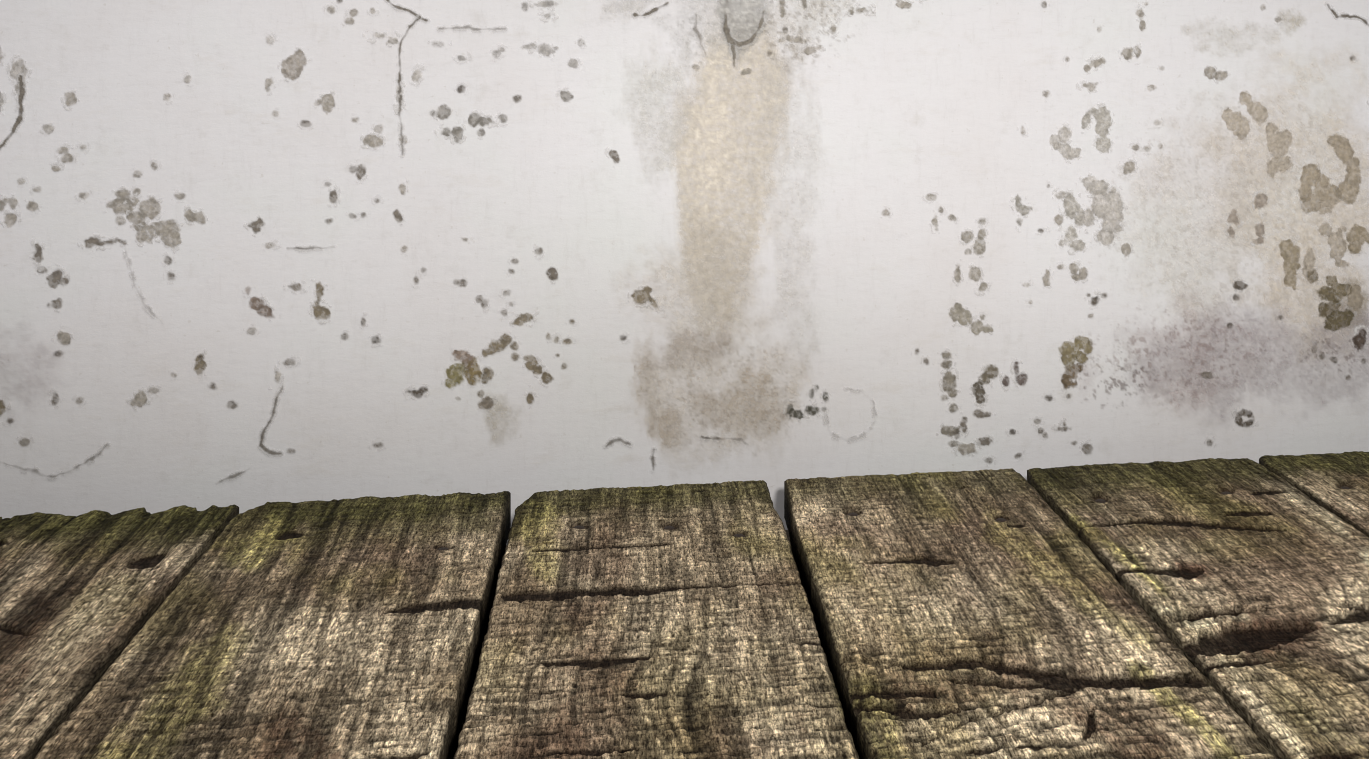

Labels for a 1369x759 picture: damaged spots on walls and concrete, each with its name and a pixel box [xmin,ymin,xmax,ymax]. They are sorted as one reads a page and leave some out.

crack [386,0,428,102]
crack [1331,9,1367,24]
crack [0,75,25,148]
peeling [82,163,205,277]
leakage [660,30,788,321]
peeling [928,194,993,334]
peeling [1027,145,1162,317]
peeling [1222,91,1369,361]
crack [260,386,283,455]
peeling [446,312,571,409]
peeling [916,349,1027,463]
peeling [1046,336,1092,401]